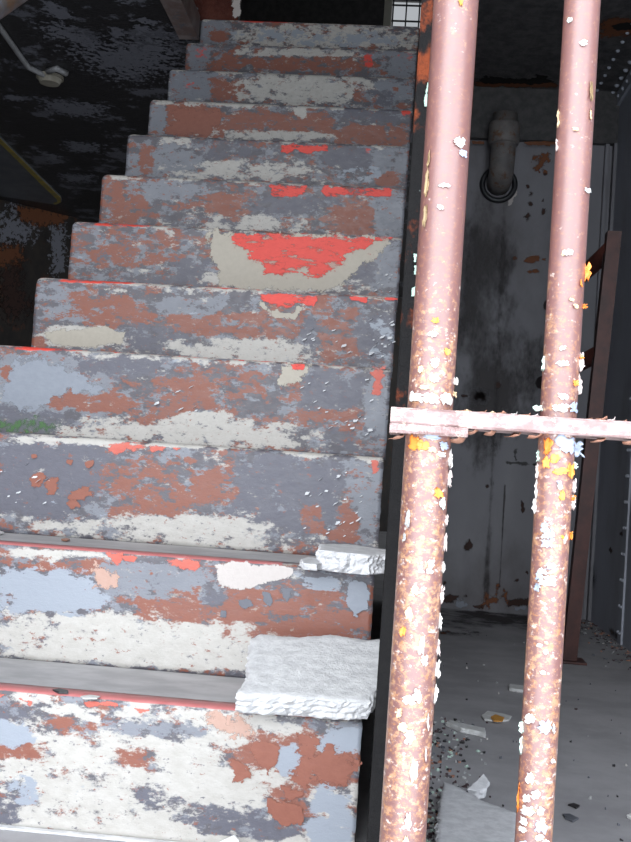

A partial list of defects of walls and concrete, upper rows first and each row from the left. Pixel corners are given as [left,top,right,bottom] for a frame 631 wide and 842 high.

peeling [0,94,118,118]
peeling [162,103,222,138]
peeling [35,139,107,162]
peeling [0,202,71,278]
peeling [44,326,125,349]
peeling [0,353,104,416]
peeling [29,472,59,504]
peeling [66,486,95,509]
peeling [214,557,322,609]
peeling [345,580,371,617]
peeling [230,737,280,785]
peeling [267,732,362,826]